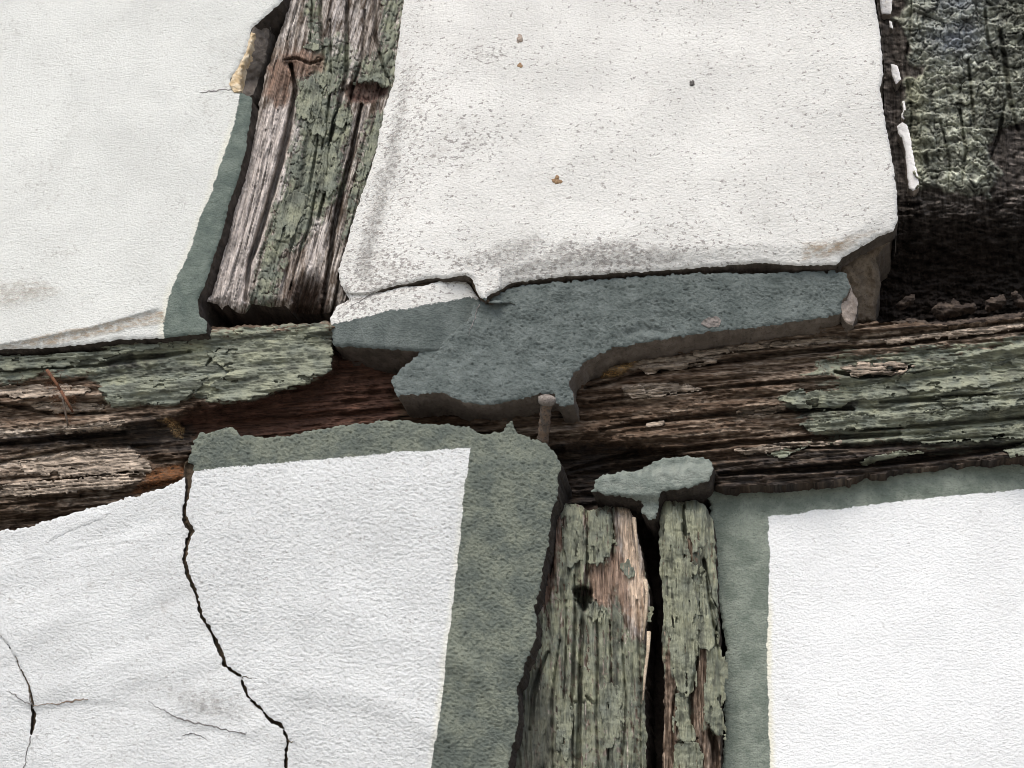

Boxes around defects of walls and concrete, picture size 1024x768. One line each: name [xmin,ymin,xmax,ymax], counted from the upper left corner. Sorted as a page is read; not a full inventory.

spalling [229,26,277,111]
peeling [295,68,389,198]
peeling [890,64,919,205]
crack [352,281,438,306]
crack [467,279,492,333]
peeling [98,334,334,407]
peeling [767,356,1024,466]
peeling [47,509,110,542]
crack [183,461,293,768]
peeling [647,506,728,768]
crack [10,656,88,768]
crack [148,701,246,740]